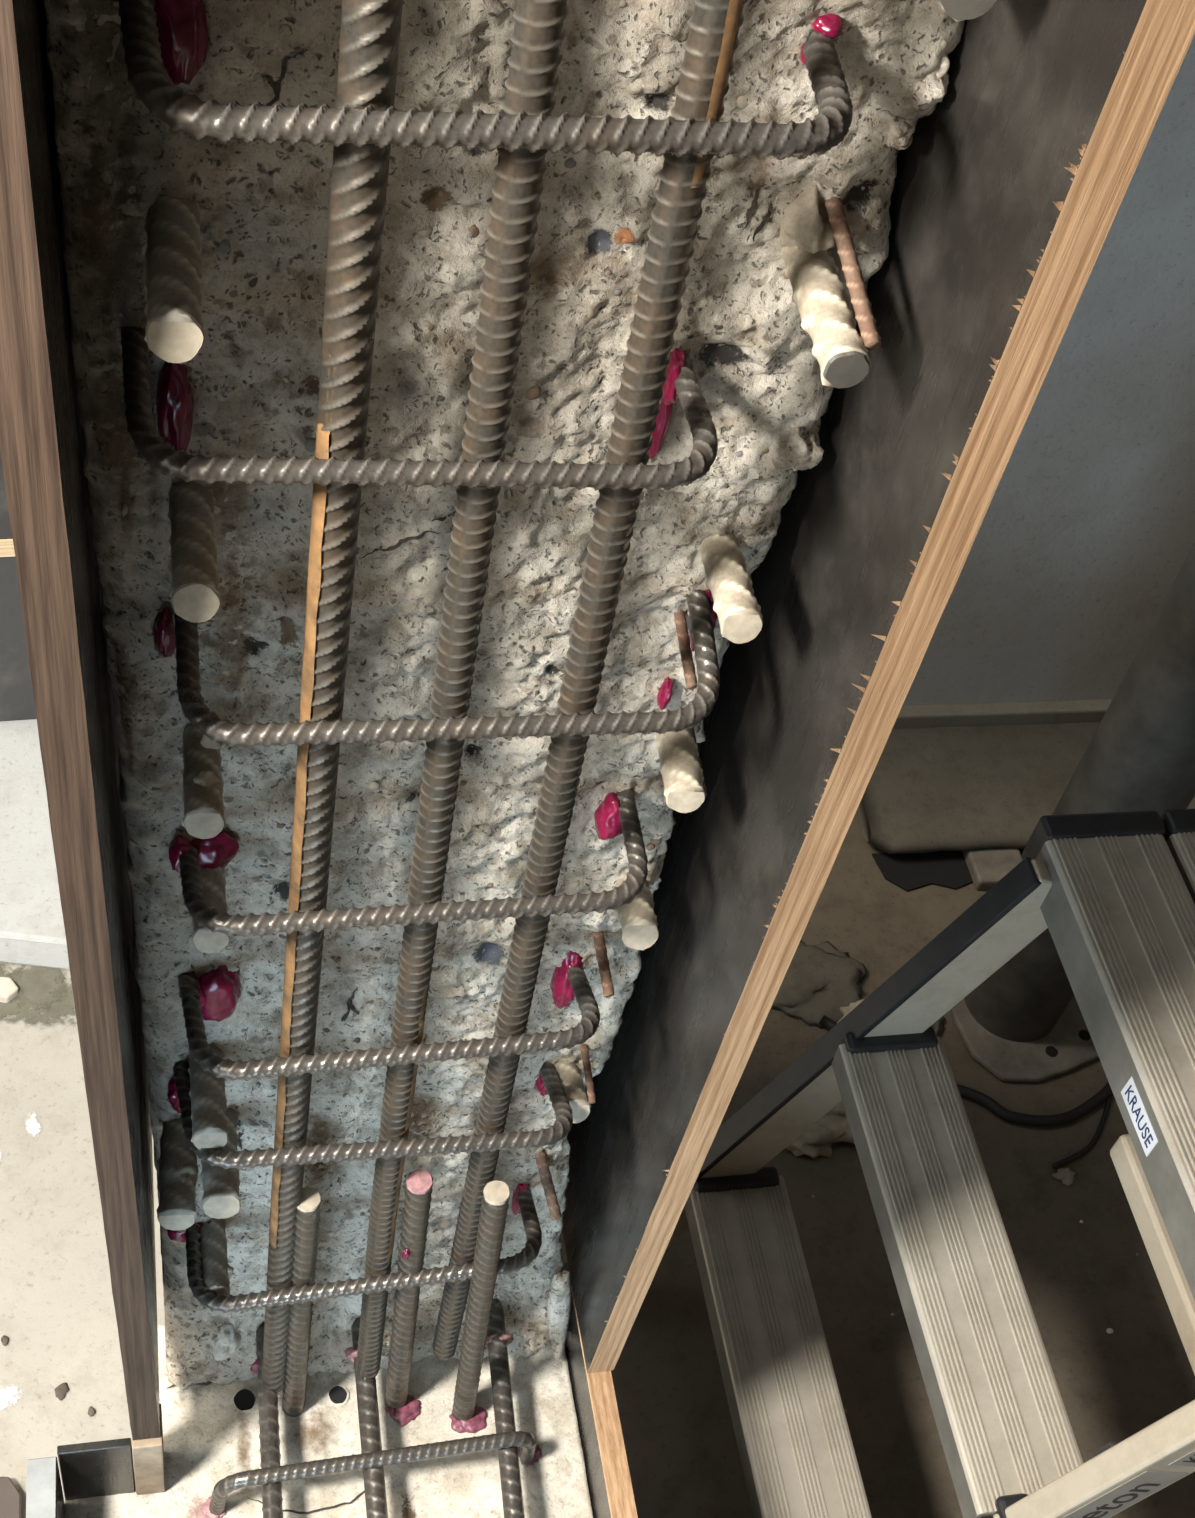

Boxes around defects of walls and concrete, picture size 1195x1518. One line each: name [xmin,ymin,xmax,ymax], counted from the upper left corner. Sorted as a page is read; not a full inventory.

crack [265,49,308,106]
spalling [328,0,403,110]
spalling [283,143,391,460]
corrosion [614,228,634,244]
spalling [586,153,713,465]
spalling [243,483,364,723]
crack [361,511,456,558]
spalling [546,488,643,715]
spalling [236,929,349,1518]
spalling [327,922,440,1518]
spalling [432,914,551,1360]
corrosion [294,1421,326,1444]